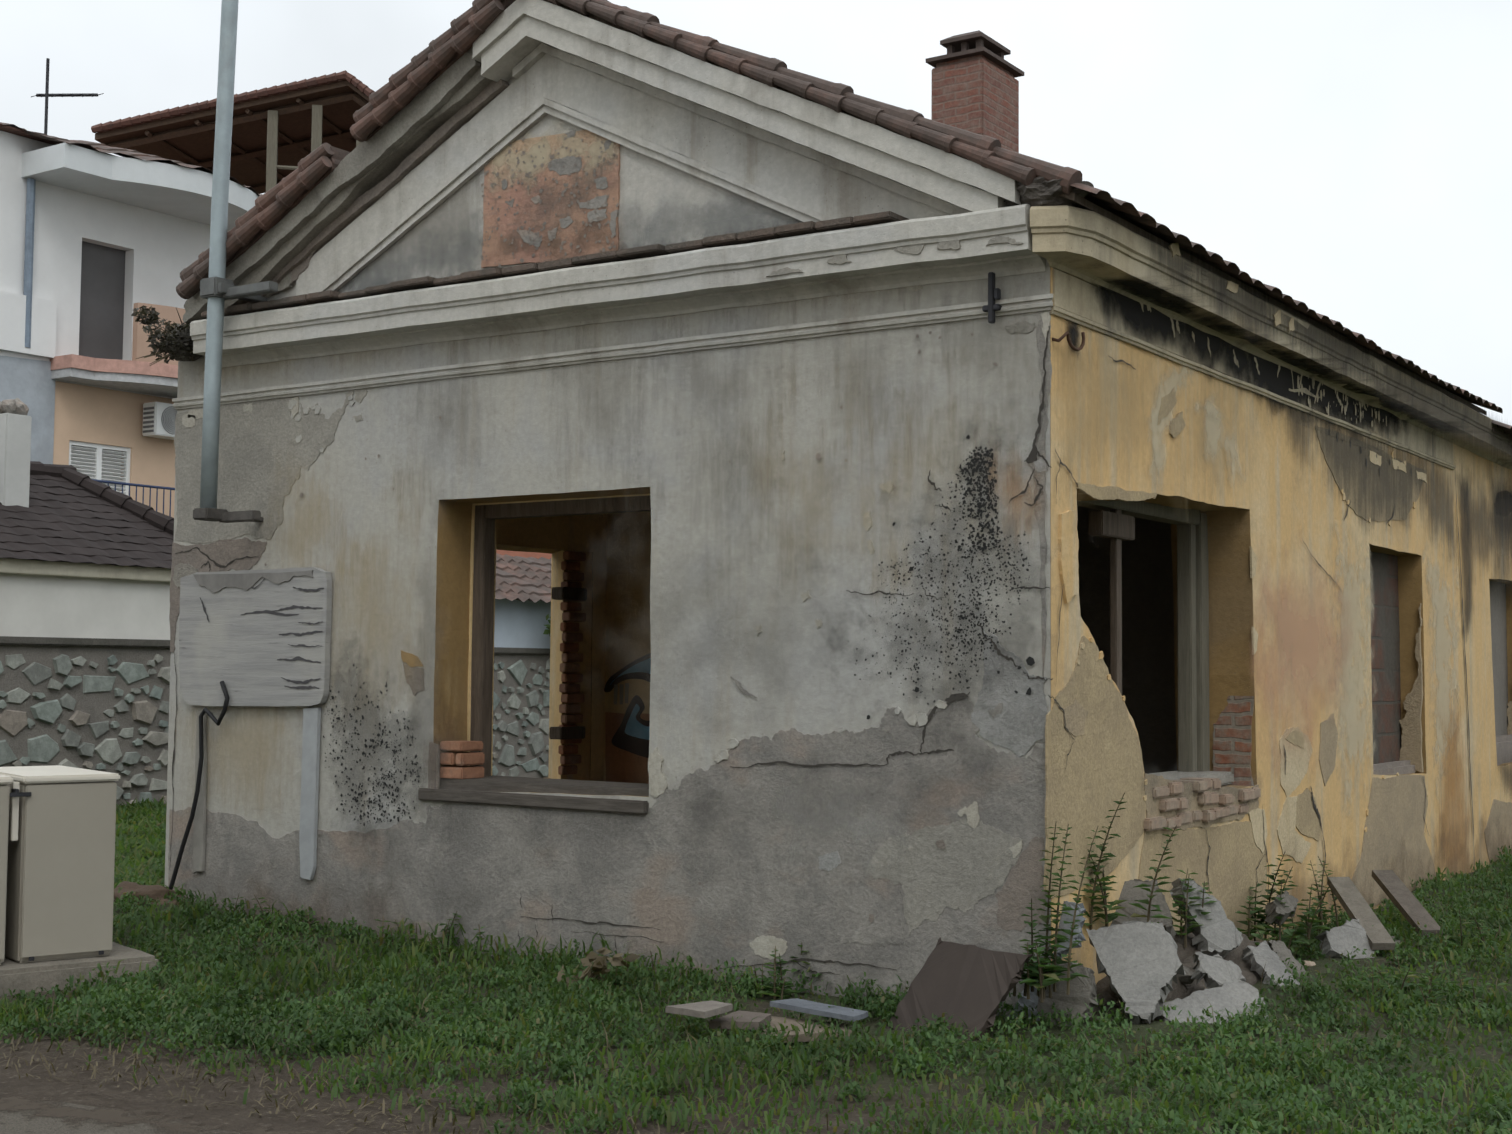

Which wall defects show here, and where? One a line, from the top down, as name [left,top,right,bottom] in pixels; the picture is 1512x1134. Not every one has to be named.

flaking render [481,130,620,268]
crack [1010,326,1078,506]
damp [1170,317,1211,357]
damp [1233,349,1321,403]
mould [848,435,1030,705]
mould [323,658,421,826]
peeling [168,311,1338,1019]
crack [730,692,970,768]
peeling [1352,603,1437,906]
peeling [1484,799,1512,865]